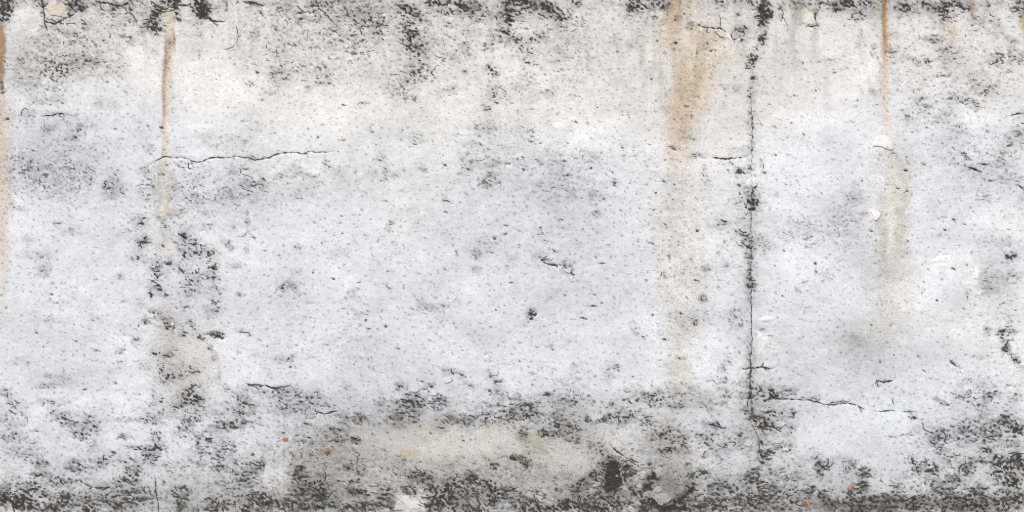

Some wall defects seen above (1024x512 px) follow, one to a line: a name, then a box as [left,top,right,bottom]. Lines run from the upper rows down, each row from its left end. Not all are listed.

crack [701,15,742,40]
crack [144,151,330,169]
crack [669,107,916,453]
water stain [0,482,95,512]
water stain [206,470,345,512]
water stain [328,424,622,512]
water stain [991,452,1024,505]